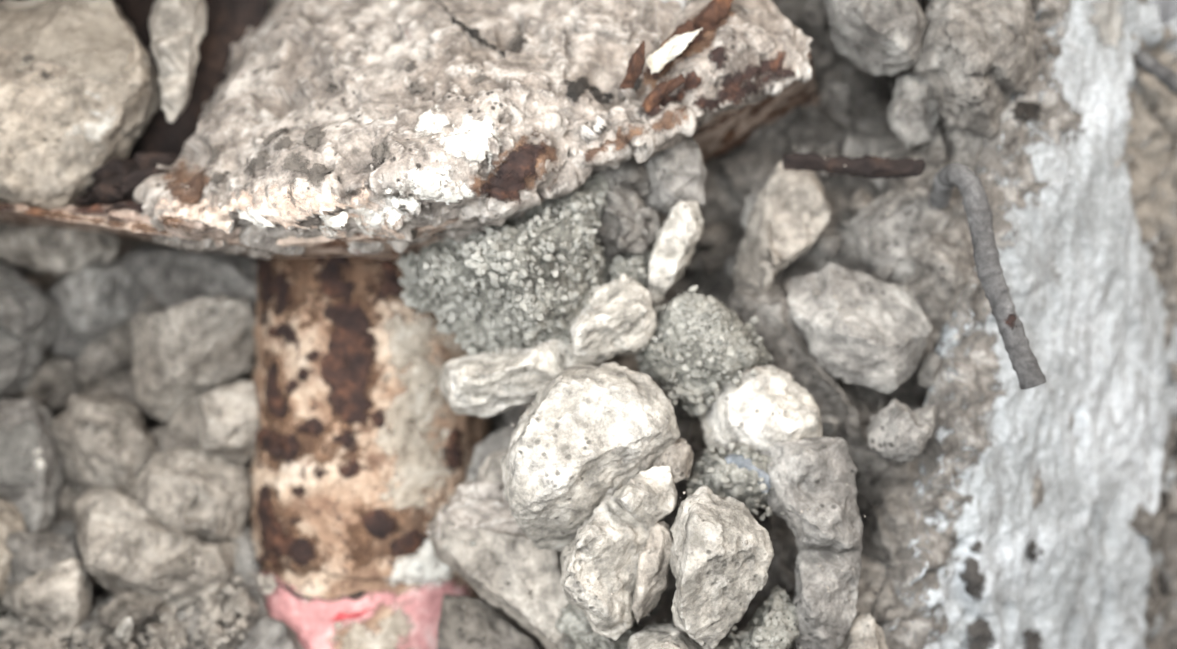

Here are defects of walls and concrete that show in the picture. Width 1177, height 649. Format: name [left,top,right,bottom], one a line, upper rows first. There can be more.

spalling [564,76,615,103]
rust [584,0,795,162]
rust [40,160,406,246]
spalling [208,126,333,198]
rust [470,129,560,204]
spalling [1115,26,1177,292]
spalling [877,0,1086,649]
rust [1005,313,1016,330]
rust [253,256,446,577]
peeling [374,310,456,510]
rust [442,429,472,469]
peeling [260,538,470,649]